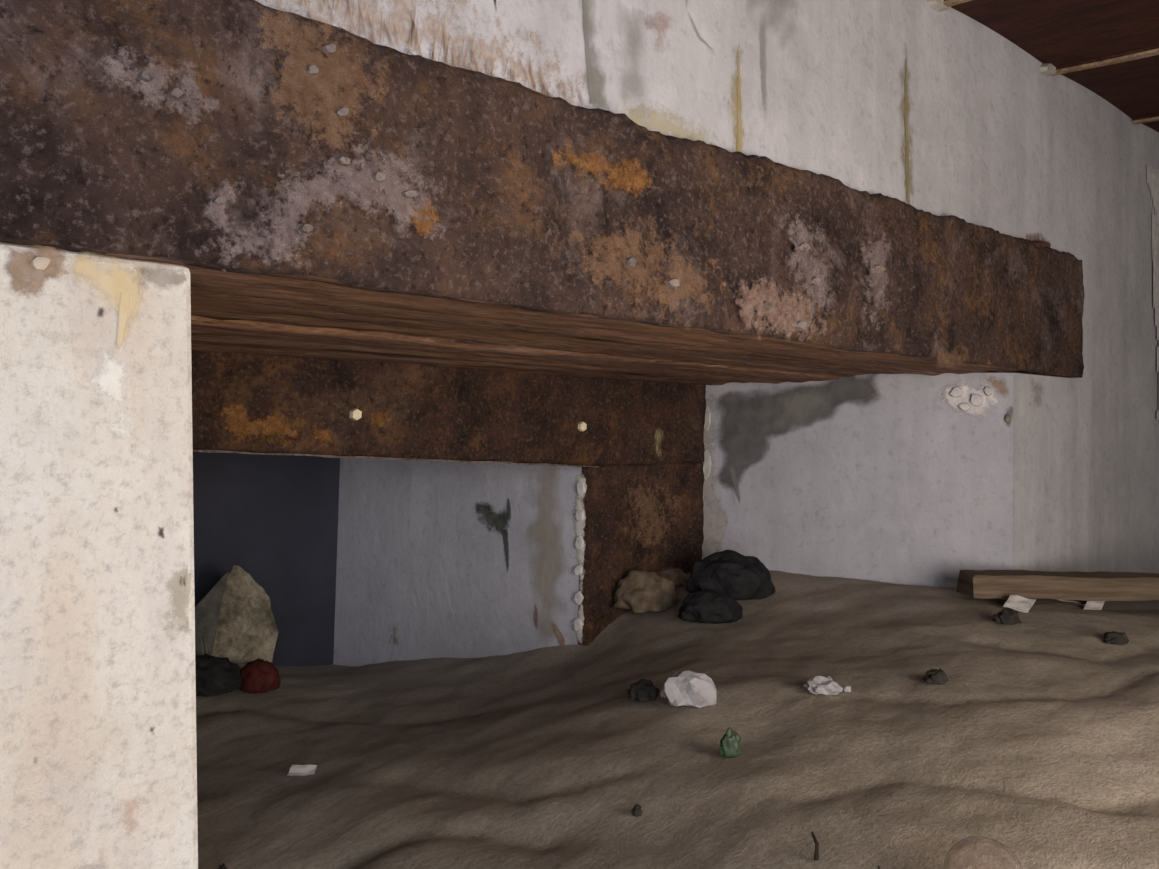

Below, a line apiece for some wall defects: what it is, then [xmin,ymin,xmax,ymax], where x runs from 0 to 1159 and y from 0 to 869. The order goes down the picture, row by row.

corrosion [101,49,219,123]
corrosion [206,0,587,261]
leakage [583,0,605,106]
corrosion [552,141,651,195]
corrosion [629,109,702,141]
corrosion [732,52,743,153]
corrosion [901,61,912,204]
corrosion [736,217,829,338]
corrosion [220,402,335,447]
leakage [719,376,877,499]
spalling [942,380,1012,425]
mould [476,499,511,570]